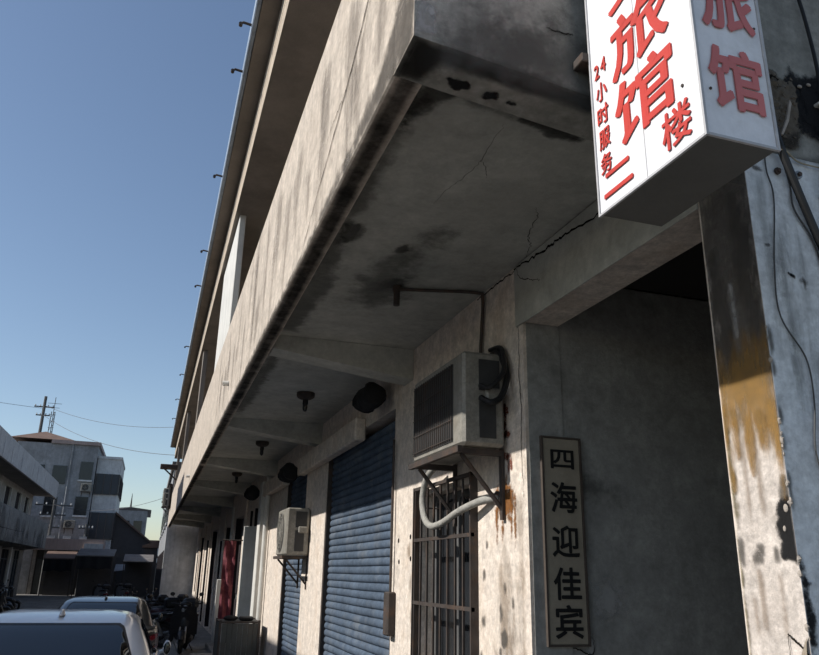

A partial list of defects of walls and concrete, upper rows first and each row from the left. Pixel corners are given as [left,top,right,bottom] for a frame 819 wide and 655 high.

spalling [768,69,811,150]
water stain [169,0,592,526]
crack [477,212,599,300]
rust [716,336,783,476]
rust [495,474,516,538]
peeling [738,538,763,564]
peeling [774,472,818,653]